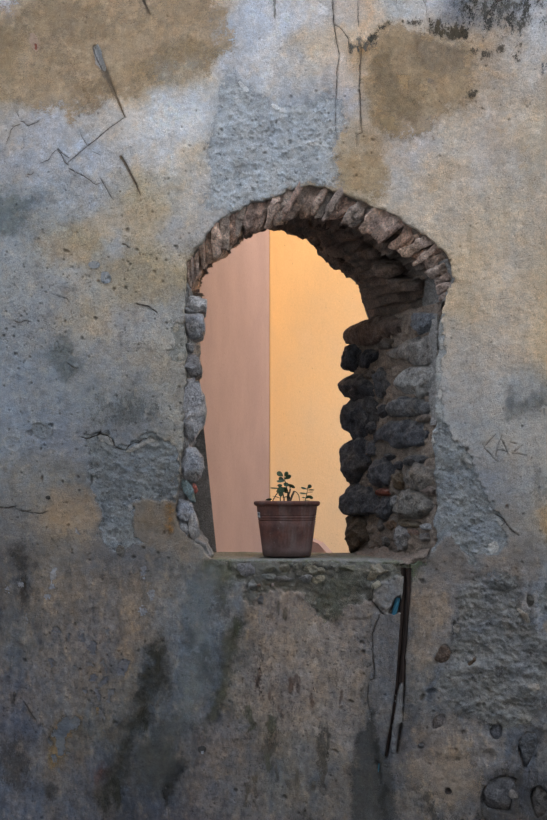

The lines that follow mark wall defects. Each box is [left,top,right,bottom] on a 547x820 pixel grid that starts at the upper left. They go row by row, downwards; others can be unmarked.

leakage [402,0,547,61]
crack [332,0,362,144]
crack [27,149,100,185]
crack [82,431,151,450]
spalling [84,432,180,552]
crack [367,588,383,715]
spalling [432,570,547,766]
leakage [311,724,330,792]
peeling [405,743,516,812]